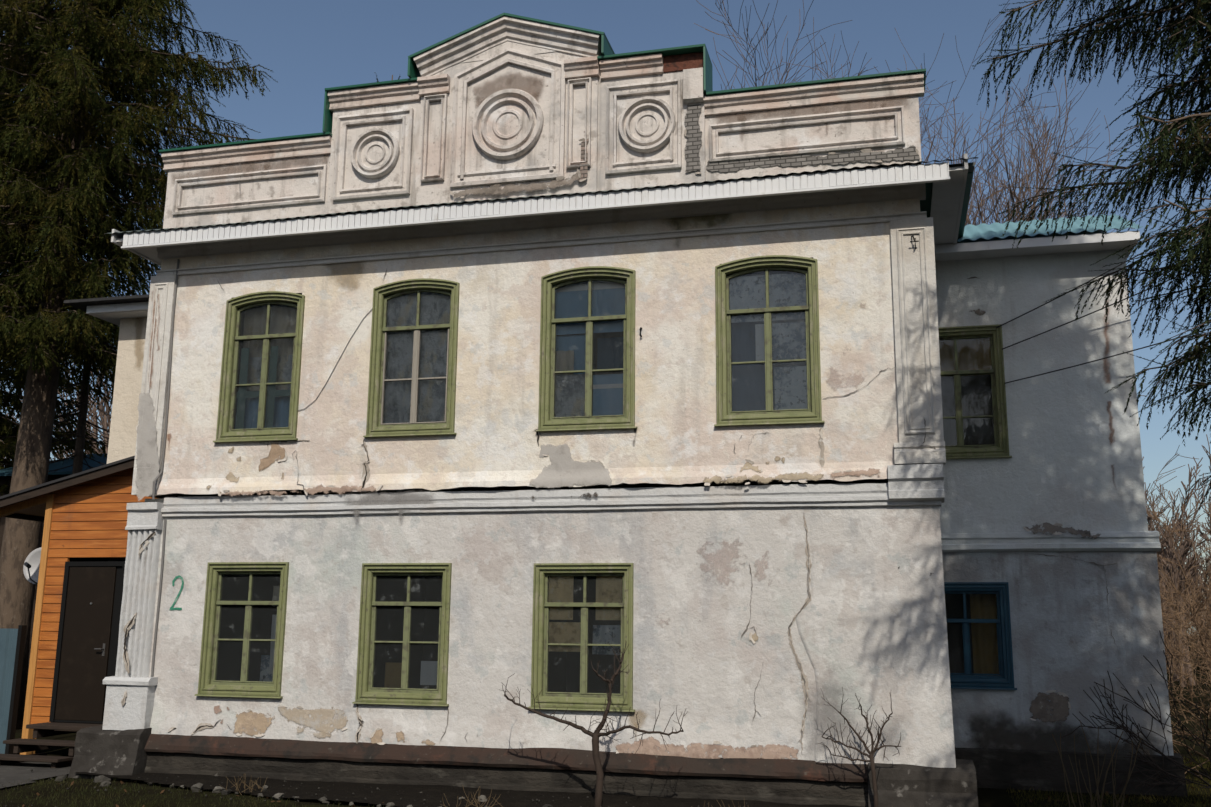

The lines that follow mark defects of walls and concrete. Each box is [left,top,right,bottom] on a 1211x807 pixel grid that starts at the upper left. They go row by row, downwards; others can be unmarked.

spalling [684,102,920,174]
spalling [206,441,383,497]
spalling [1023,522,1101,539]
crack [741,564,764,724]
crack [787,513,812,752]
spalling [214,705,405,745]
spalling [616,736,799,759]
spalling [1029,690,1071,722]